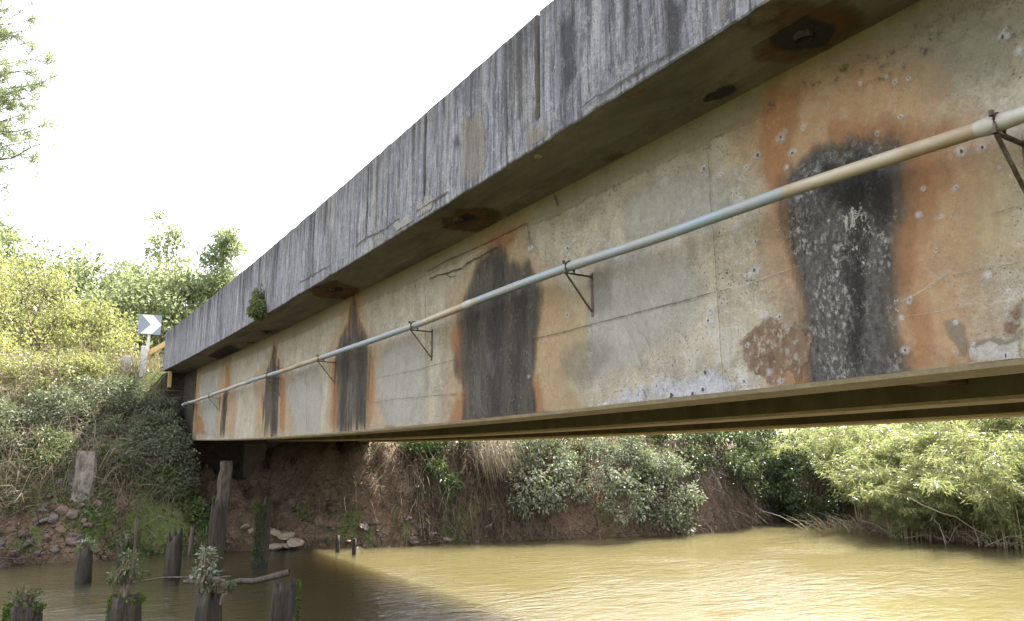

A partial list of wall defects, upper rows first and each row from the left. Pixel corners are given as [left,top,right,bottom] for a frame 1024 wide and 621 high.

rust [756,1,858,61]
rust [748,72,937,279]
water stain [263,346,320,436]
rust [311,281,382,428]
water stain [329,287,422,432]
crack [428,223,531,280]
water stain [455,249,539,420]
rust [444,208,591,420]
spalling [741,314,813,384]
water stain [787,133,920,382]
rust [885,141,971,366]